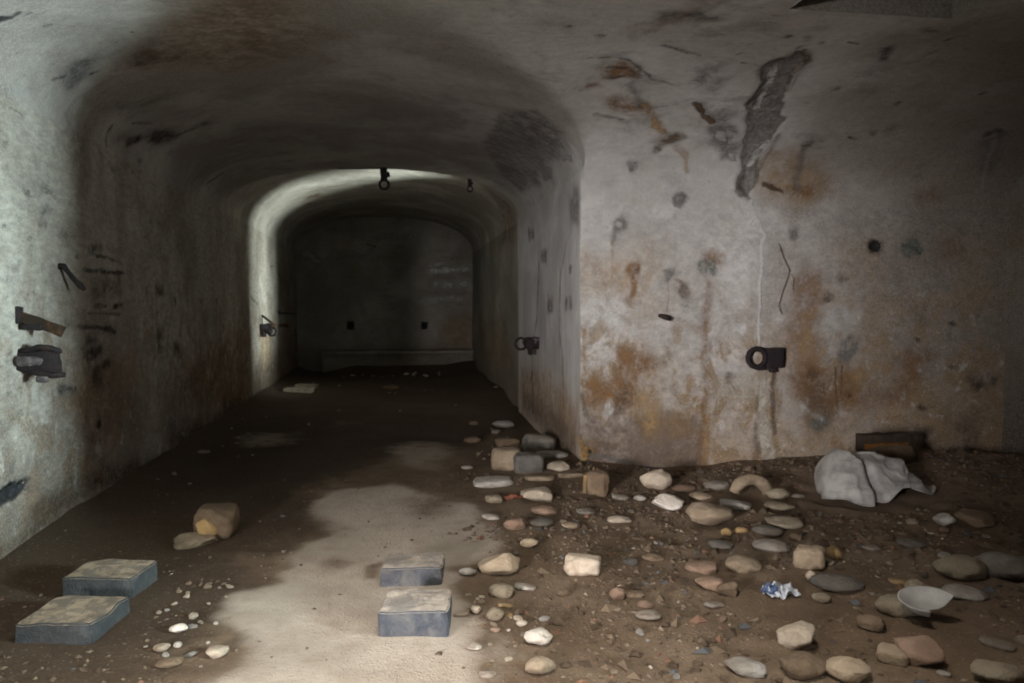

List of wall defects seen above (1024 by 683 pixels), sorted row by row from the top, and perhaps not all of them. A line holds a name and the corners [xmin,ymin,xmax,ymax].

rust [604,57,648,79]
rust [612,99,683,151]
spalling [692,47,811,198]